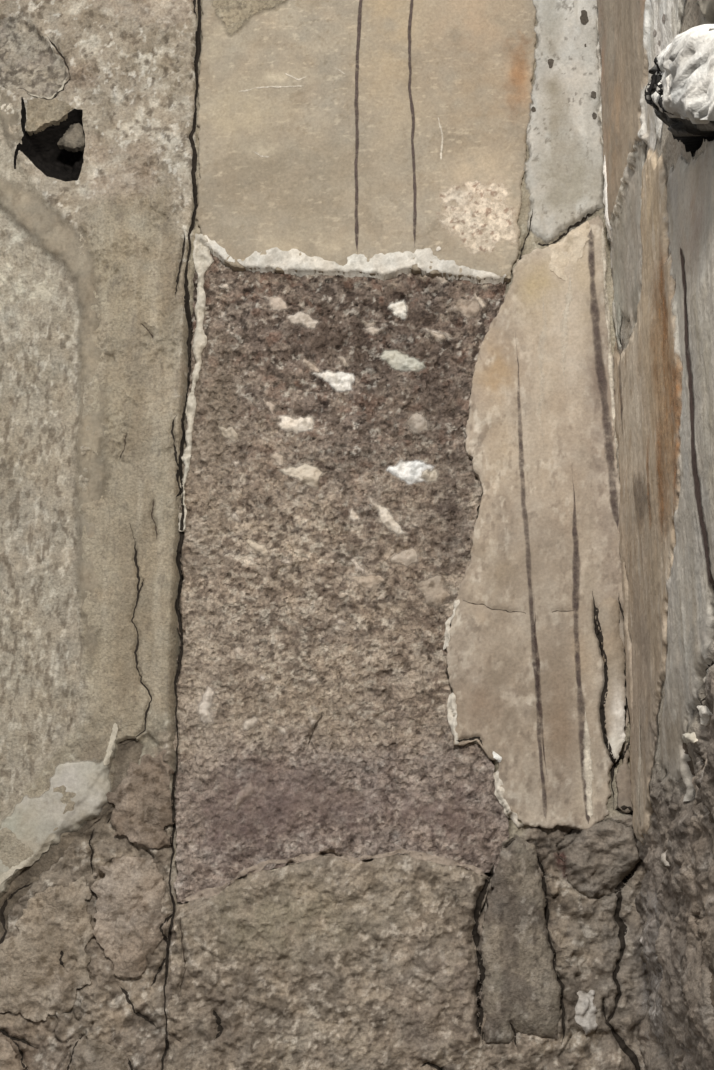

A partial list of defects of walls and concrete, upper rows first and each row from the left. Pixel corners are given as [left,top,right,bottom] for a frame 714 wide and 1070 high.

crack [36,39,71,100]
crack [119,0,201,1070]
crack [553,591,633,816]
crack [0,884,30,944]
crack [0,1029,38,1070]
flaking render [0,723,143,940]
crack [89,815,111,874]
crack [472,839,515,1044]
crack [537,853,565,1045]
crack [602,861,641,1070]